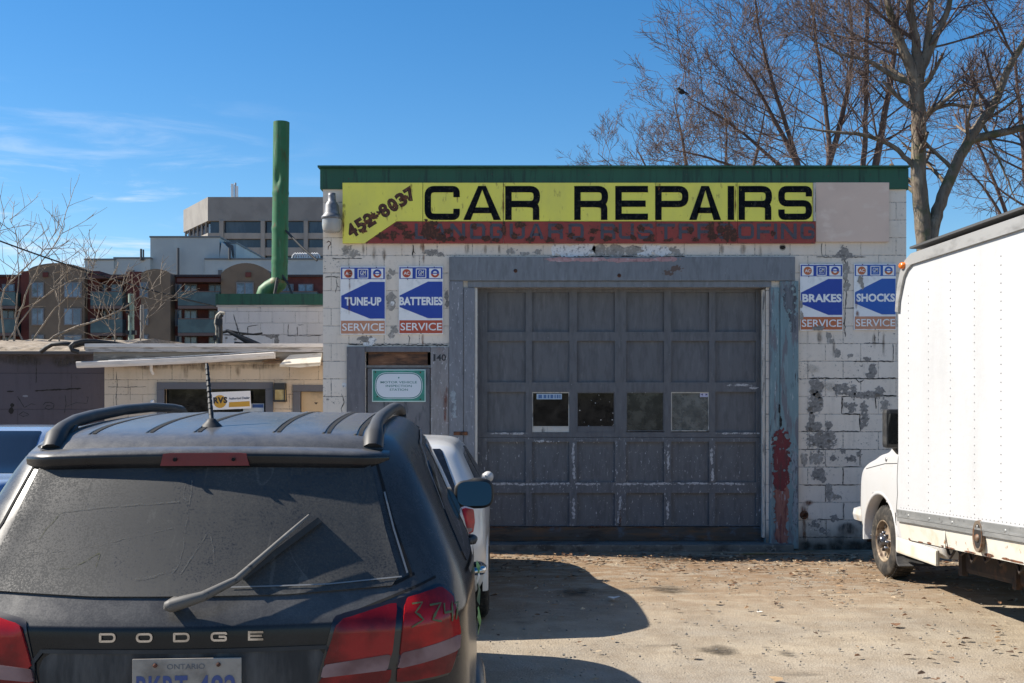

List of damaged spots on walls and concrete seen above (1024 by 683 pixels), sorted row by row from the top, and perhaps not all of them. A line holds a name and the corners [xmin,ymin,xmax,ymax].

corrosion [360,185,671,249]
peeling [506,244,684,276]
peeling [771,281,891,543]